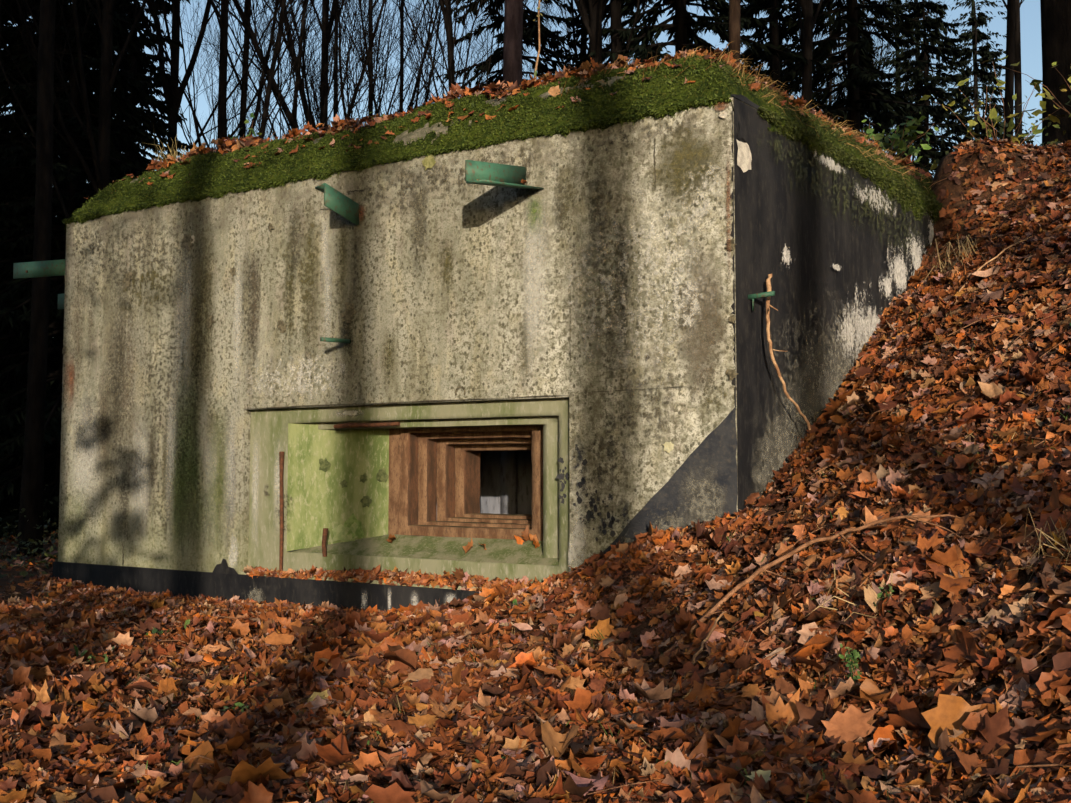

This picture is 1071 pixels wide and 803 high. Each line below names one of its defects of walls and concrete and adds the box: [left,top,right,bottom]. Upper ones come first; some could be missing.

water stain [366,161,472,254]
water stain [599,121,720,208]
water stain [237,262,259,346]
water stain [285,210,359,329]
water stain [440,249,452,290]
water stain [569,180,727,407]
water stain [71,226,233,529]
water stain [260,359,329,394]